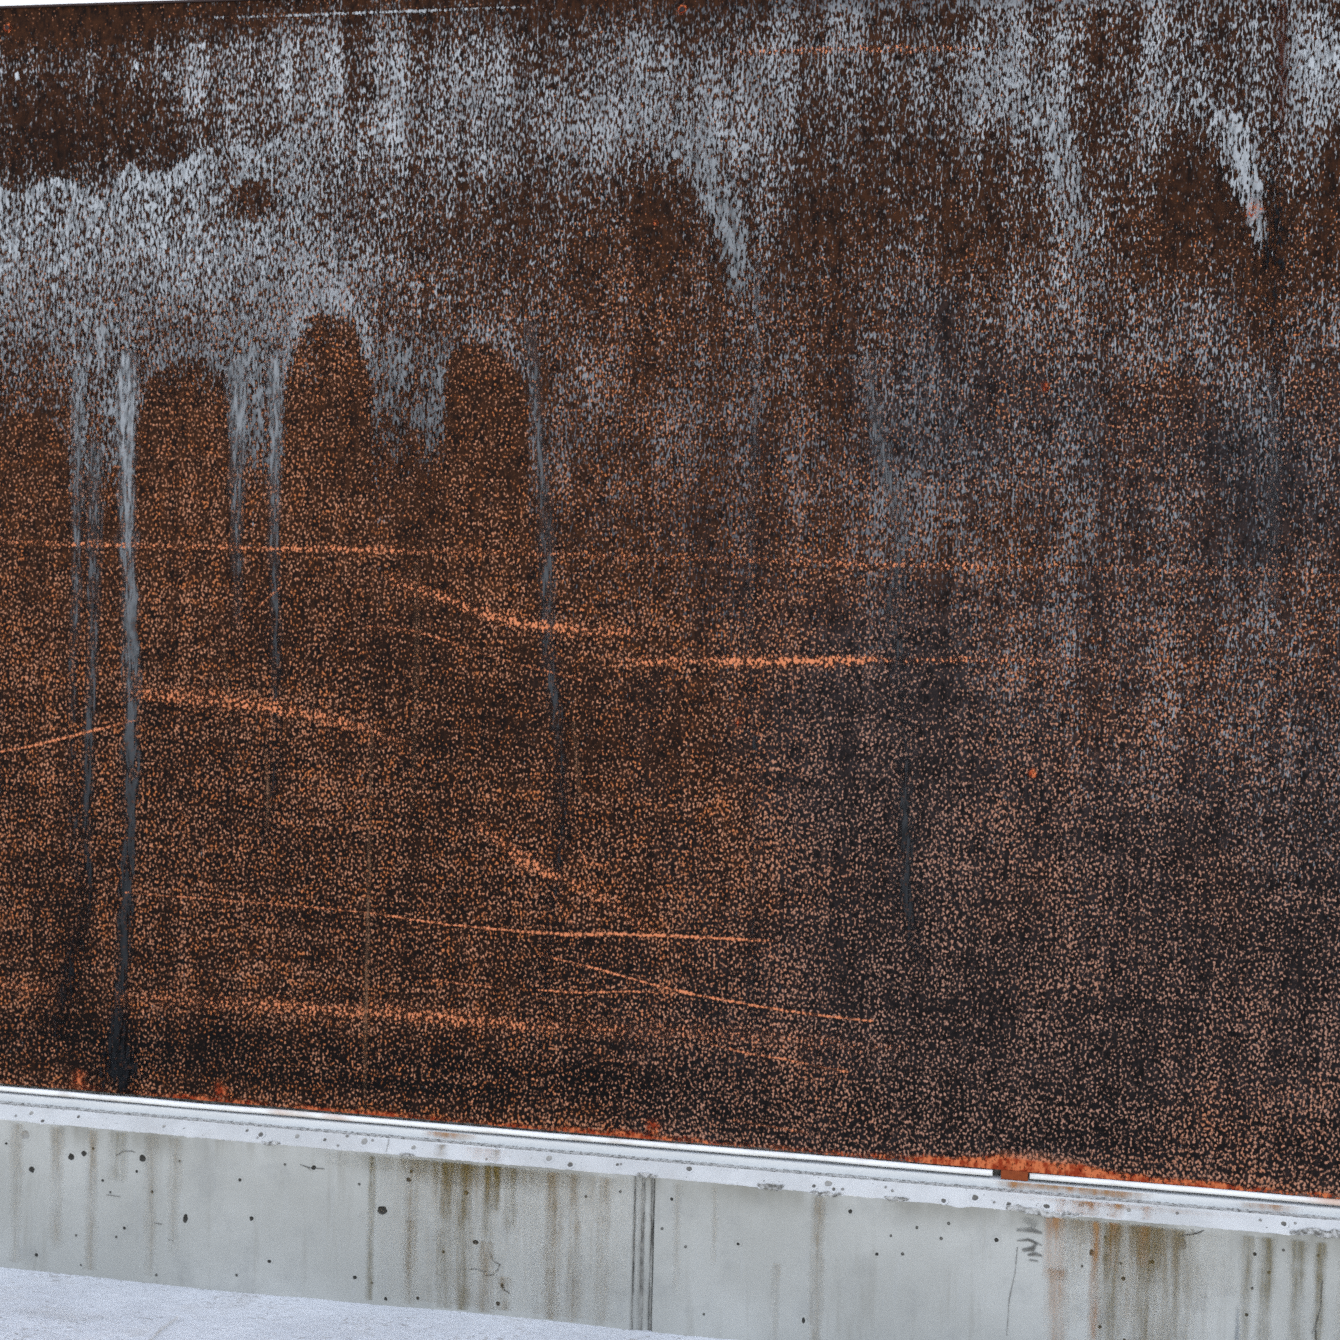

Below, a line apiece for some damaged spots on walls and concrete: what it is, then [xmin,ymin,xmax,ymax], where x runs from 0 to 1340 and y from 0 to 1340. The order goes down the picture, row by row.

damp [627,82,759,315]
damp [359,324,454,476]
damp [0,132,381,1096]
corrosion [192,542,634,559]
corrosion [389,574,651,641]
damp [530,366,564,773]
corrosion [613,651,1050,669]
corrosion [138,686,399,746]
corrosion [475,822,653,931]
corrosion [115,957,907,1053]
corrosion [150,1082,460,1136]
corrosion [488,1121,1340,1208]